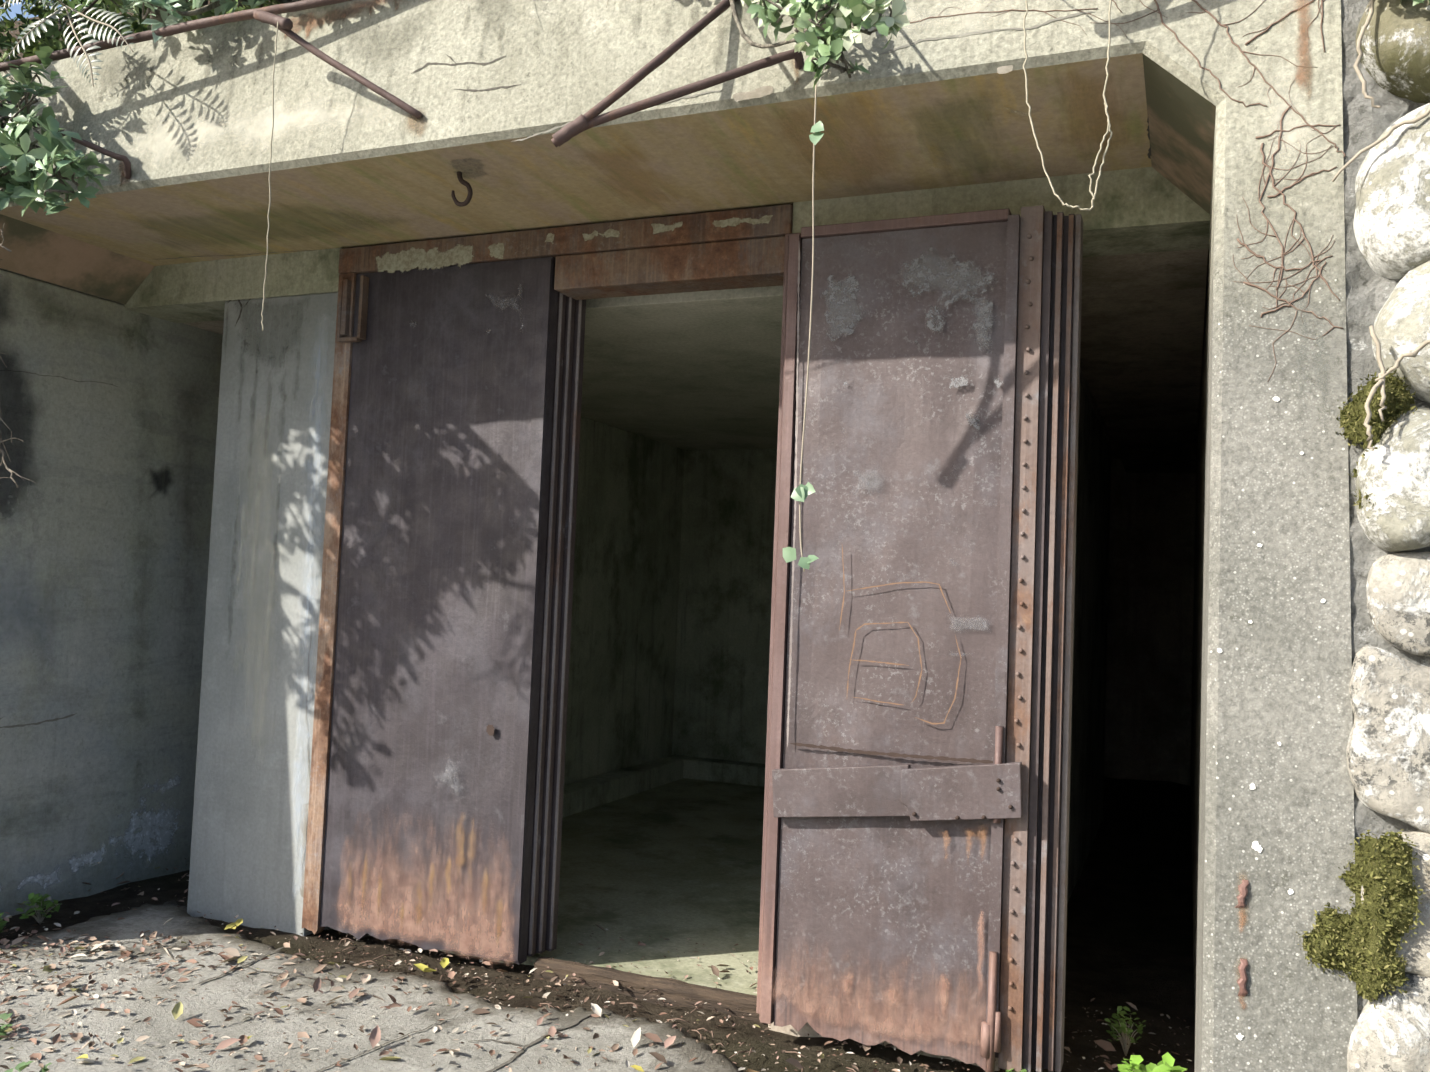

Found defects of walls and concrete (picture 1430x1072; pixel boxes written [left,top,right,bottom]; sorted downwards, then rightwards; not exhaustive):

corrosion [285,0,397,36]
crack [411,55,521,91]
peeling [707,215,773,228]
peeling [376,242,504,274]
peeling [897,247,995,353]
peeling [949,377,968,388]
damp [0,352,33,513]
damp [153,470,171,492]
crack [0,713,77,728]
damp [0,775,182,892]
corrosion [339,864,511,959]
corrosion [776,976,977,1042]